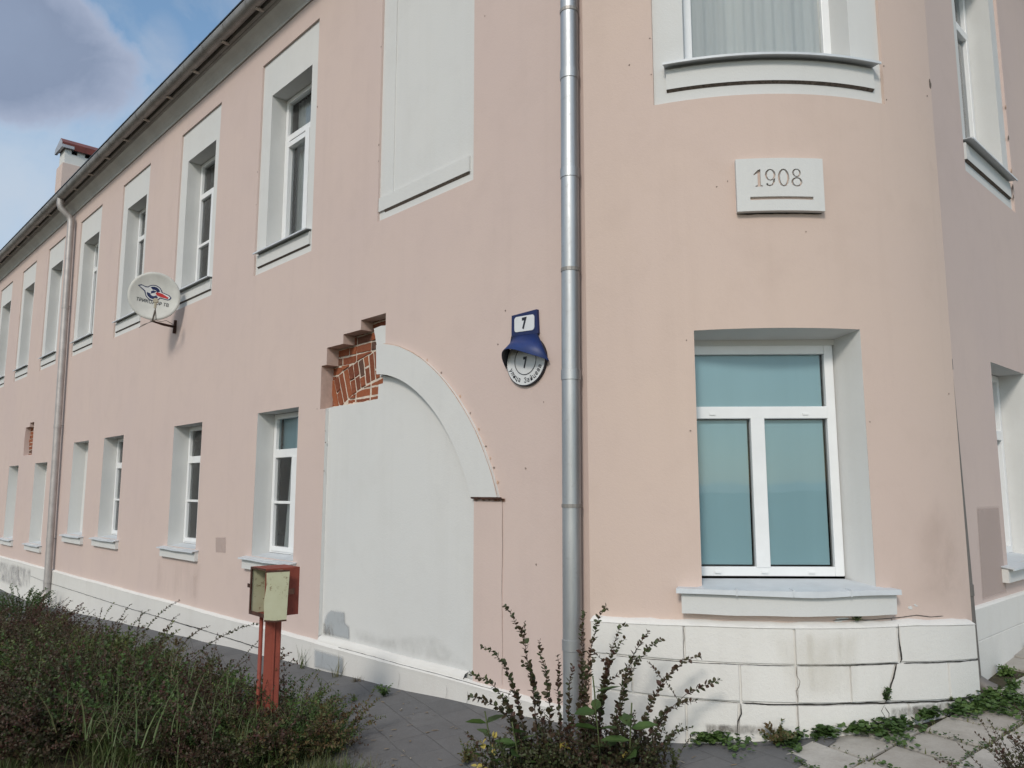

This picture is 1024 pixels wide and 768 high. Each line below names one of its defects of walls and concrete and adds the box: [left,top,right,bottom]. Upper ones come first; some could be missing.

flaking render [332,319,502,500]
crack [621,615,979,733]